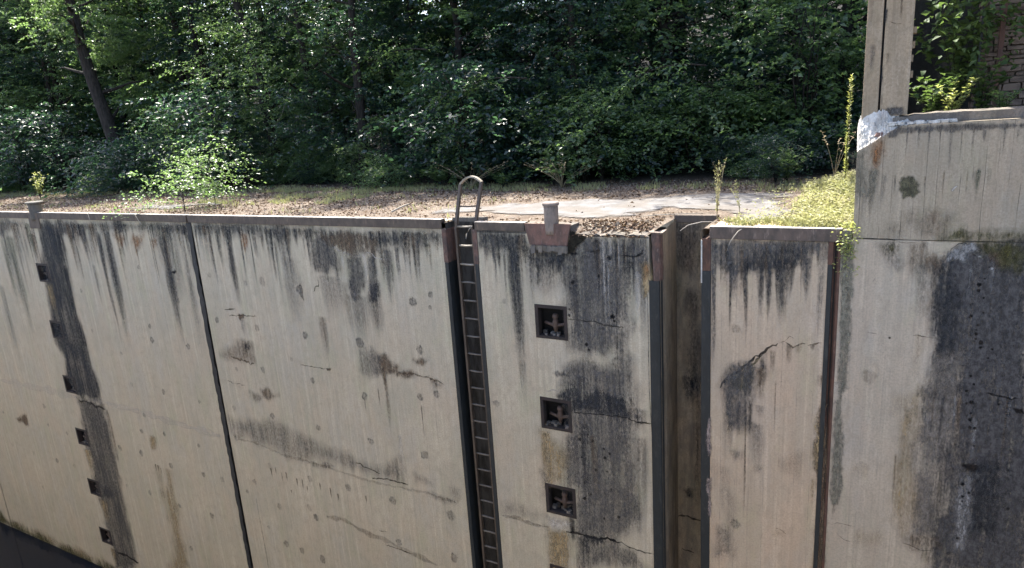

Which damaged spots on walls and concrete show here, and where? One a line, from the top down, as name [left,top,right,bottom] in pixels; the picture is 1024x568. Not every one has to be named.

spalling [857,109,911,151]
leakage [672,220,828,343]
leakage [0,219,439,568]
leakage [479,230,648,568]
crack [568,294,652,432]
leakage [723,362,763,472]
crack [720,336,819,389]
leakage [912,240,1024,568]
crack [566,520,652,554]